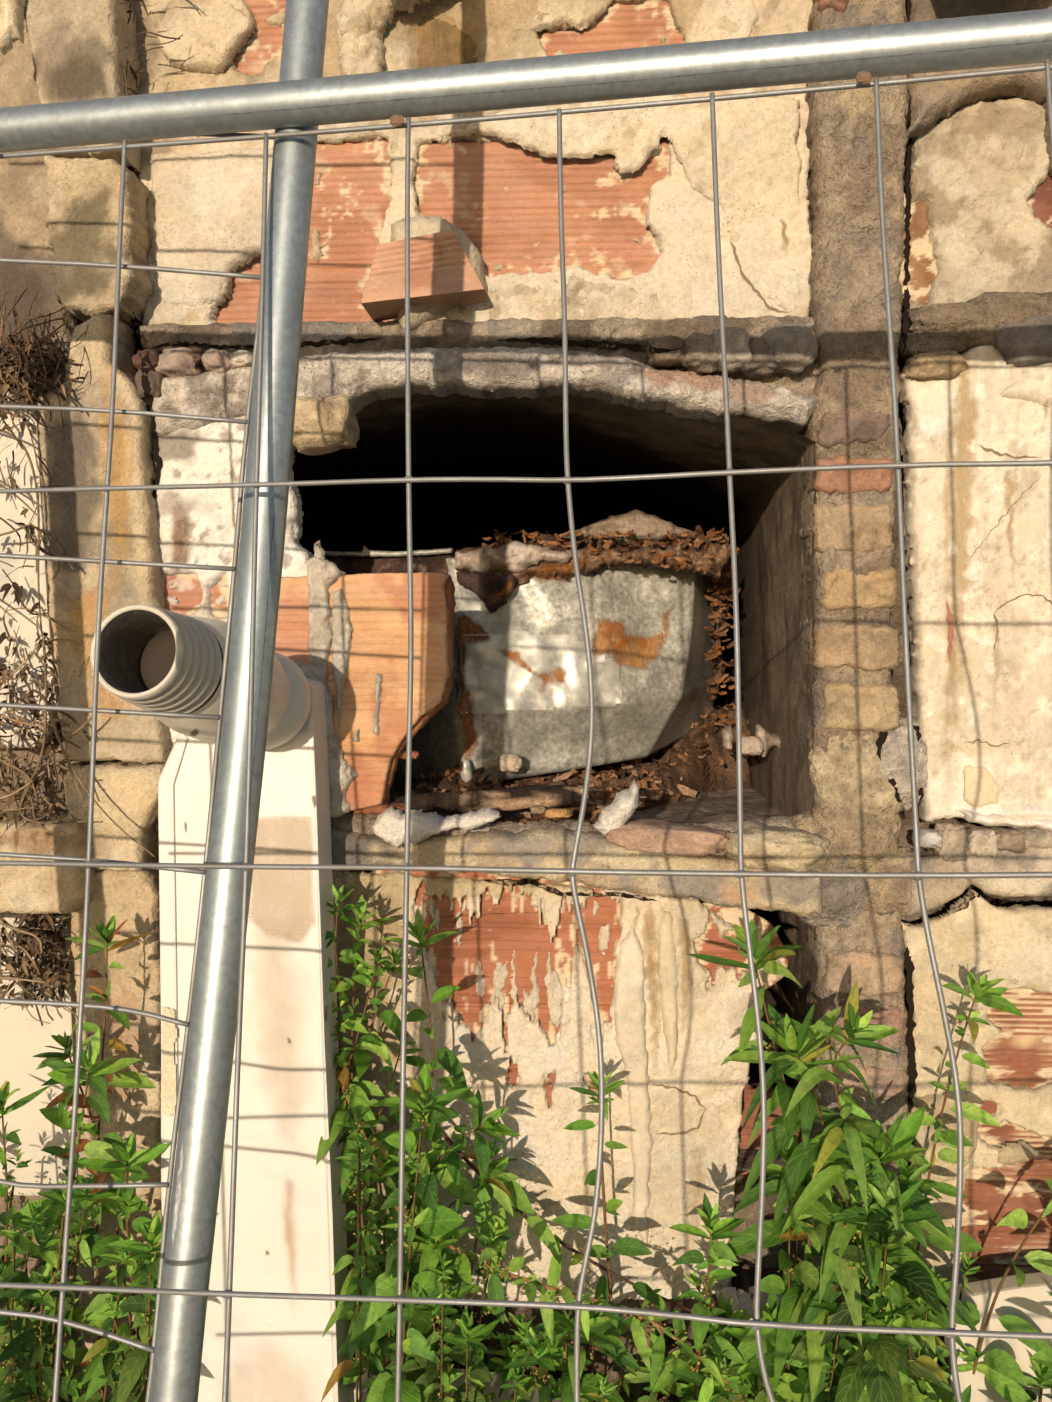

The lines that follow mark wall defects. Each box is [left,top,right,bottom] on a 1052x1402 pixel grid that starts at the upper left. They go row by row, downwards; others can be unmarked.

spalling [339,0,430,56]
flaking render [537,0,685,56]
flaking render [302,137,670,335]
crack [902,89,912,355]
flaking render [899,193,938,312]
leakage [950,373,975,626]
leakage [1006,478,1014,530]
flaking render [371,870,654,1087]
flaking render [694,902,788,990]
crack [904,887,1052,1146]
flaking render [982,988,1052,1089]
flaking render [961,1101,1052,1282]